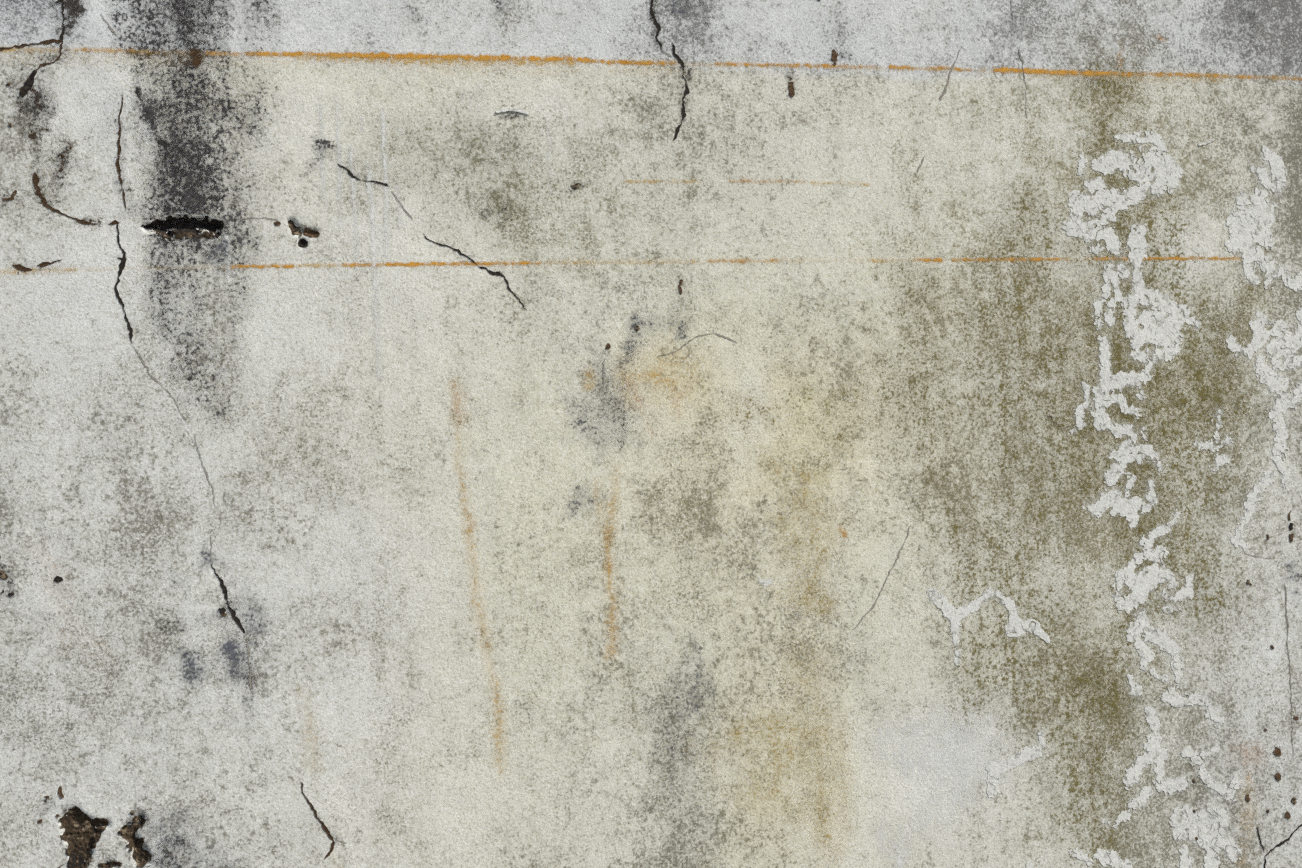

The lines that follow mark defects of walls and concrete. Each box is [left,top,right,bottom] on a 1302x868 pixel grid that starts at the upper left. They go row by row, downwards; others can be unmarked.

leakage [6,0,80,203]
crack [0,0,116,91]
rust [247,51,675,66]
crack [648,0,691,140]
rust [931,67,1137,77]
spalling [142,214,233,264]
leakage [107,0,280,428]
rust [231,261,541,269]
crack [338,164,527,310]
peeling [1224,145,1302,552]
peeling [1062,130,1242,868]
spalling [37,786,153,868]